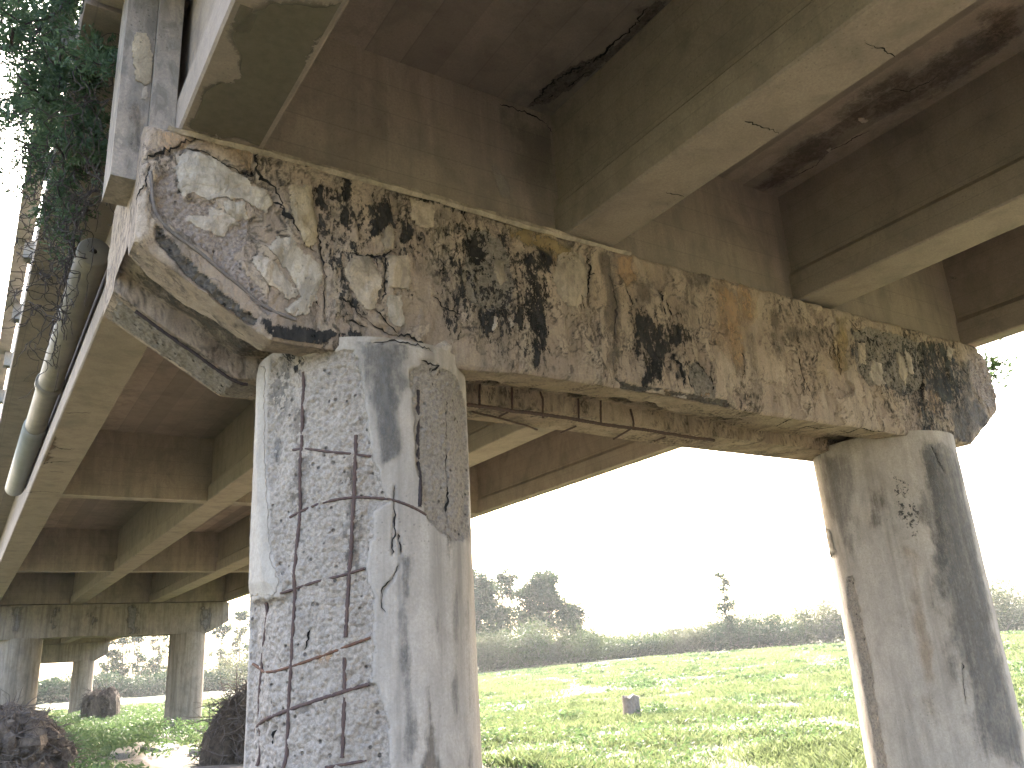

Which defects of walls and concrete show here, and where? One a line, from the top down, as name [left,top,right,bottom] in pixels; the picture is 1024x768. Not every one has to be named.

flaking render [132,32,153,100]
crack [501,9,646,132]
spalling [148,150,323,325]
crack [136,138,440,372]
water stain [261,178,554,462]
water stain [599,253,703,389]
water stain [846,320,988,442]
crack [381,485,401,611]
spalling [110,298,732,768]
water stain [920,444,1022,764]